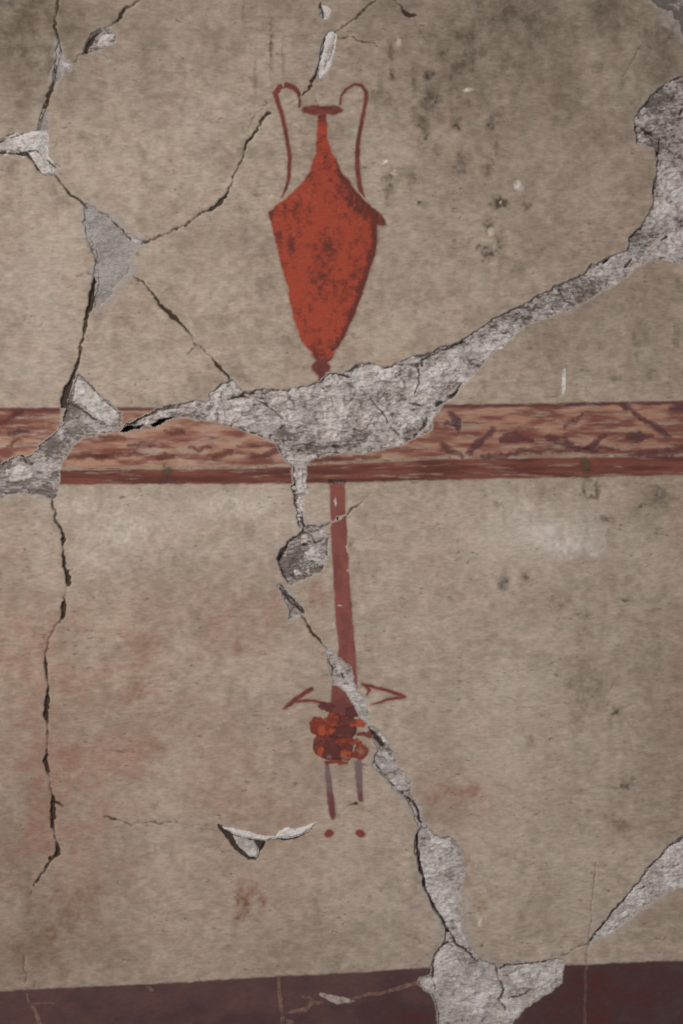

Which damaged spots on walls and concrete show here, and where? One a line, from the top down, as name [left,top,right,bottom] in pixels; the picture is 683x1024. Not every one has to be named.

crack [38,0,86,131]
crack [142,112,271,243]
crack [61,259,98,422]
crack [137,278,188,332]
spalling [0,77,683,619]
crack [52,502,71,619]
crack [279,585,322,644]
crack [43,647,51,724]
crack [31,750,61,892]
flaking render [217,821,317,860]
spalling [278,650,565,1024]
spalling [590,836,683,940]